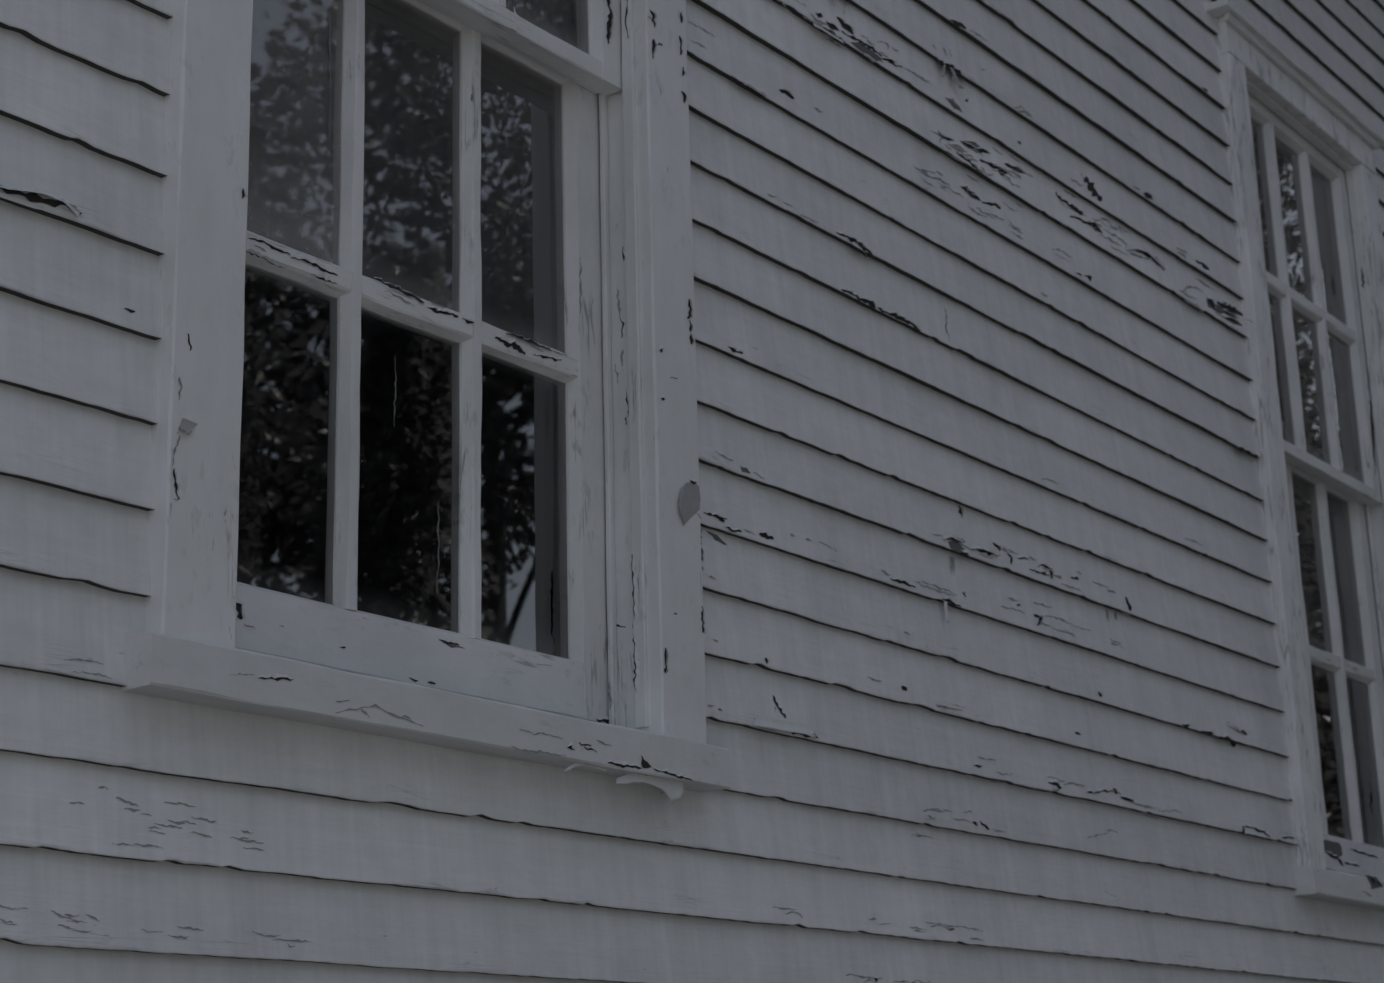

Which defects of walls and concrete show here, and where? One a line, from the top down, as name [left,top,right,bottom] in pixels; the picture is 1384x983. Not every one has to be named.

peeling [778,0,930,83]
peeling [731,72,795,99]
peeling [0,180,82,217]
peeling [246,236,338,284]
peeling [836,231,875,257]
peeling [374,277,474,324]
peeling [1176,247,1255,330]
peeling [495,332,567,362]
peeling [679,478,837,579]
peeling [882,570,967,623]
peeling [934,532,1134,615]
peeling [439,638,465,649]